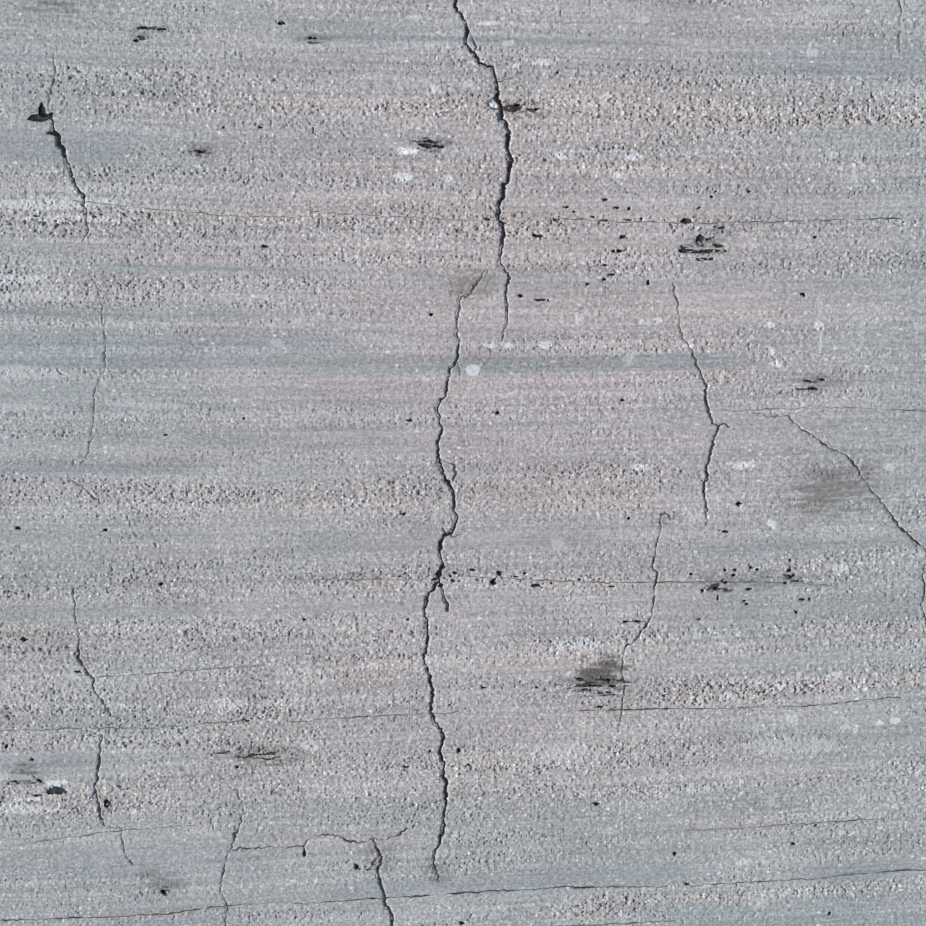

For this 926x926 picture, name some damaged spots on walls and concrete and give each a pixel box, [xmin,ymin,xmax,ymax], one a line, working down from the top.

crack [48,54,89,241]
crack [423,0,522,882]
crack [673,284,730,525]
crack [753,412,926,619]
crack [220,789,415,926]